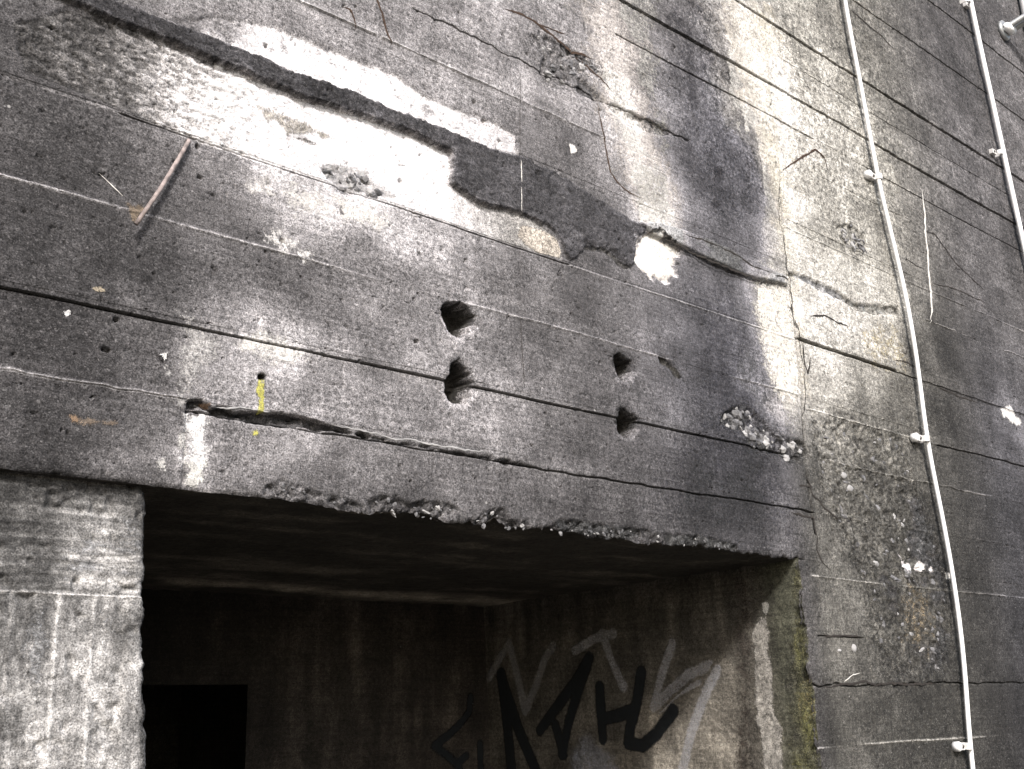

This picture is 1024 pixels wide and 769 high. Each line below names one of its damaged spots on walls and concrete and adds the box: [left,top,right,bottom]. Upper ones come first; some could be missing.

spalling [14,0,678,283]
crack [506,9,644,199]
crack [775,149,847,447]
spalling [263,478,459,521]
spalling [473,509,529,530]
spalling [548,519,738,552]
crack [792,475,839,569]